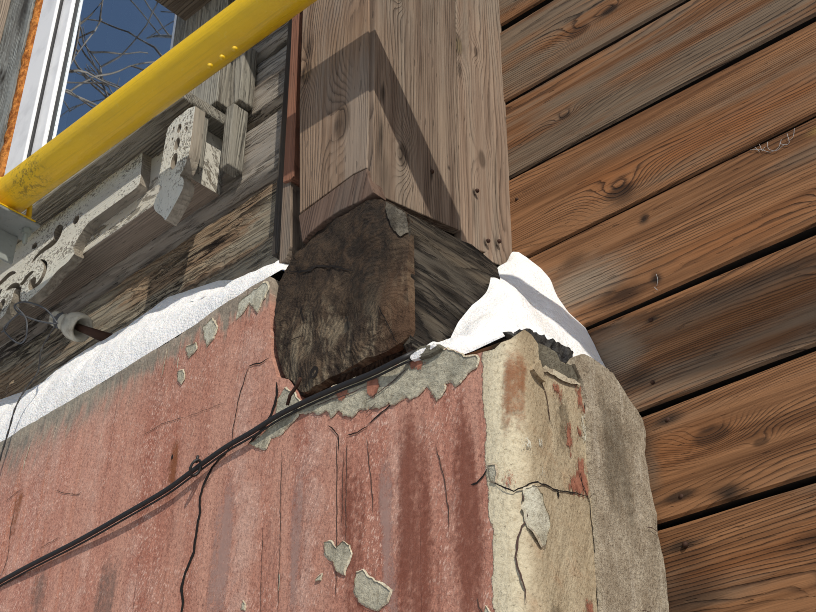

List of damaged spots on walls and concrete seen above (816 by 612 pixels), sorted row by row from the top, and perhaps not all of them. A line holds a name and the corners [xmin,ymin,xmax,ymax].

crack [145,297,304,612]
peeling [324,540,393,612]
crack [311,329,408,547]
peeling [249,347,480,450]
crack [433,443,449,528]
peeling [487,463,551,548]
crack [471,464,595,599]